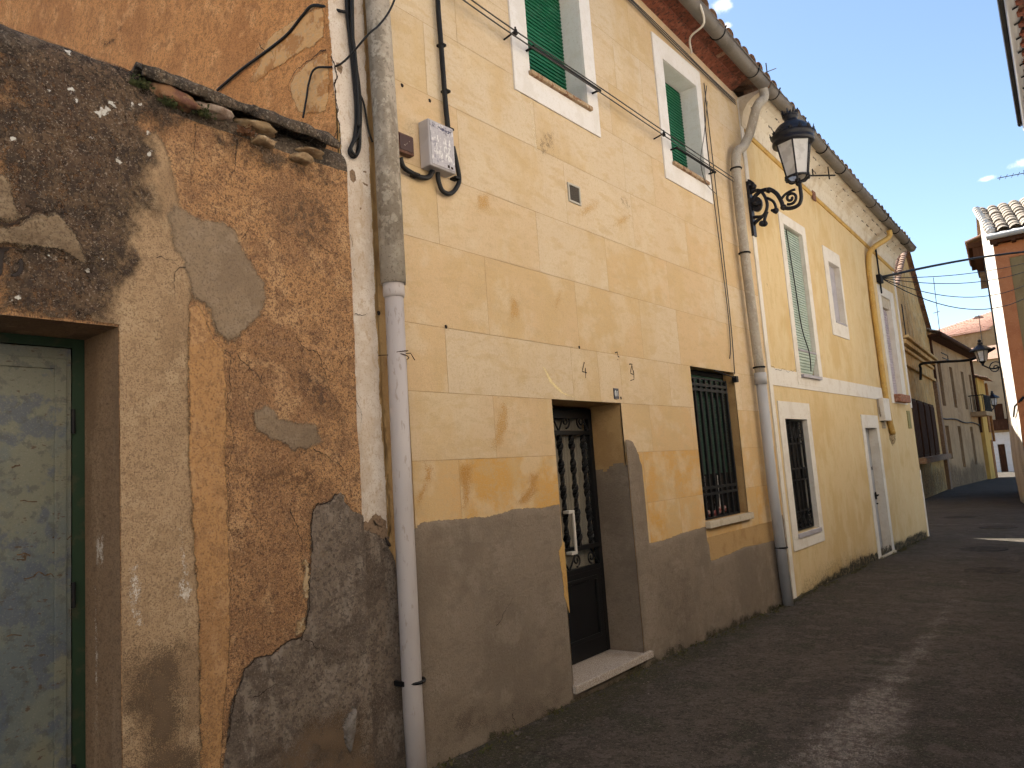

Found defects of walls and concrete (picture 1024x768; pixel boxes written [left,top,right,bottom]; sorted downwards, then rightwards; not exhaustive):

spalling [249,8,343,114]
spalling [223,493,406,768]